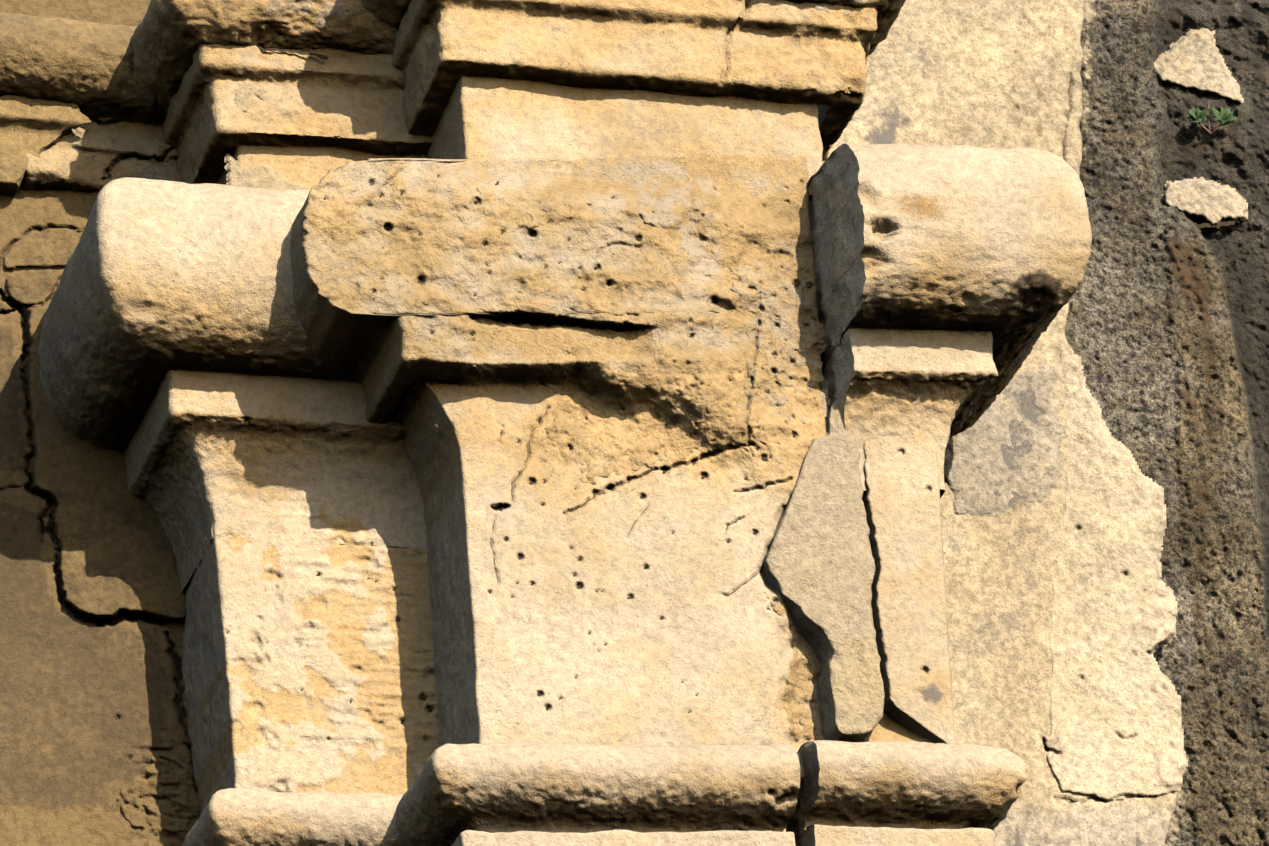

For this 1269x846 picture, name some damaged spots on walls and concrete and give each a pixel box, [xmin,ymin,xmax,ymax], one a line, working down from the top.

crack [104,154,166,180]
crack [0,226,65,259]
crack [0,278,198,819]
crack [491,408,549,578]
crack [565,399,753,535]
crack [725,479,791,531]
flaking render [944,348,1188,802]